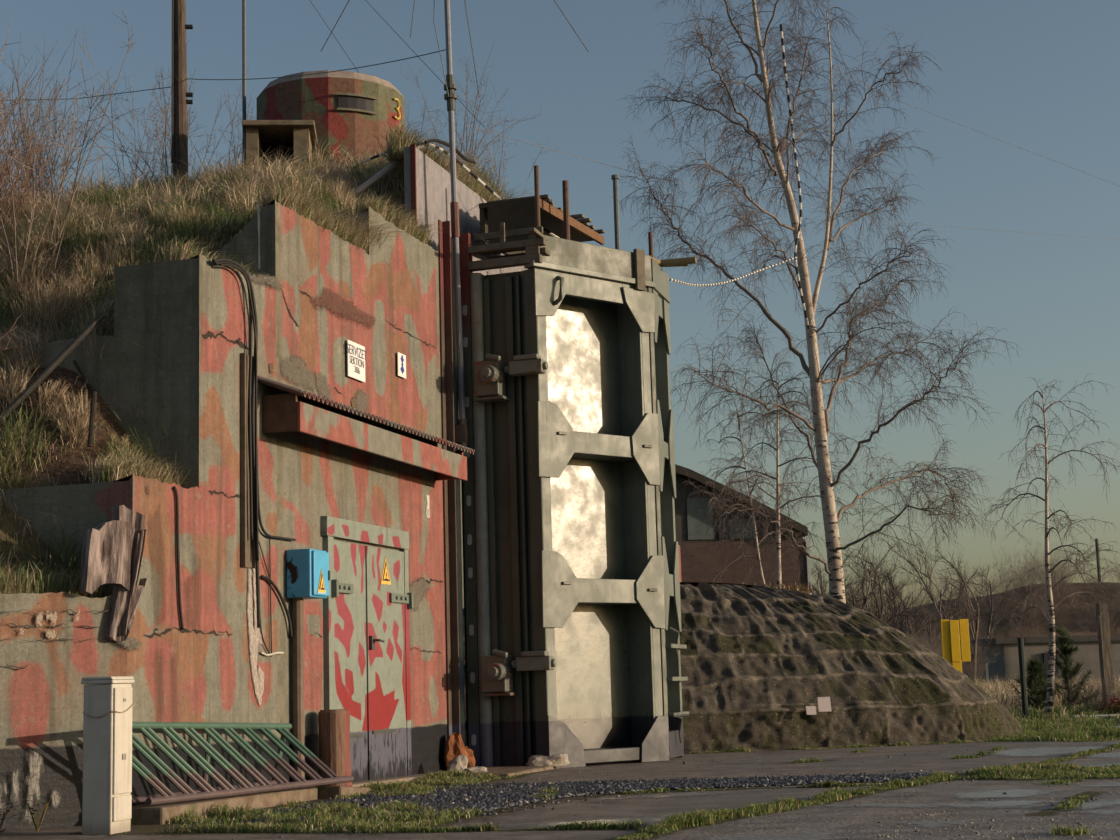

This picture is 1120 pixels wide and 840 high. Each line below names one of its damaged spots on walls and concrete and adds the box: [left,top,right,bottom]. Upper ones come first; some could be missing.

crack [280,285,312,327]
crack [202,331,249,349]
crack [386,320,437,349]
peeling [17,611,58,640]
crack [144,627,234,638]